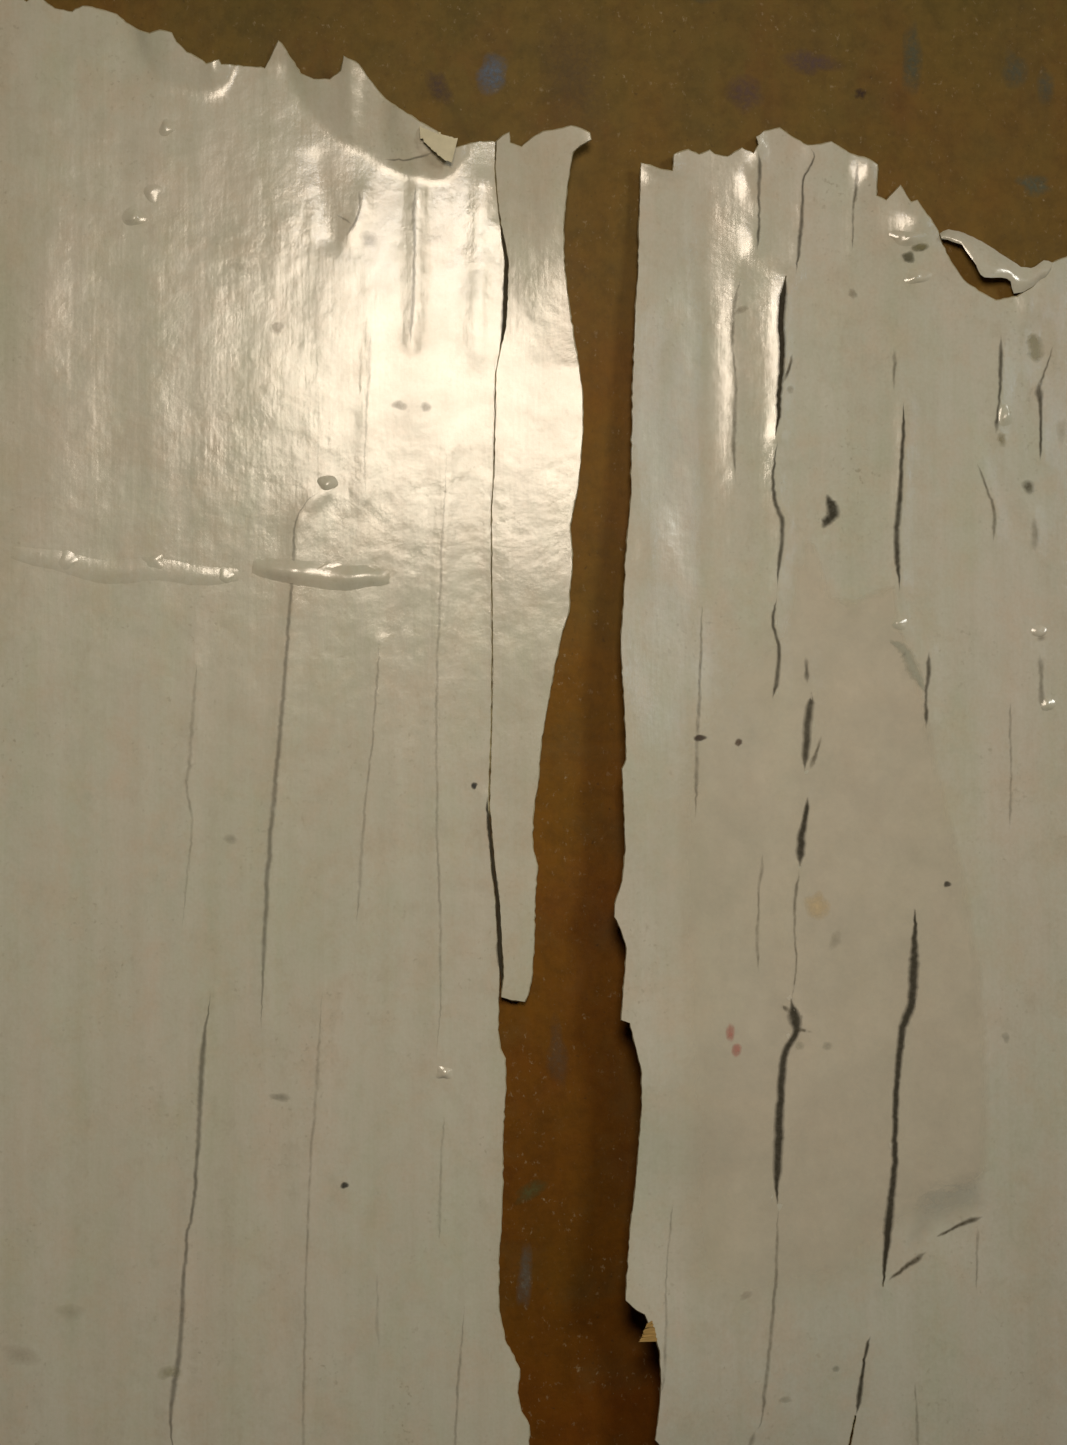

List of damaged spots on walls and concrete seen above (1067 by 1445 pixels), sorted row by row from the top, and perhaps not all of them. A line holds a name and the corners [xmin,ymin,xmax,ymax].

peeling [45,0,1067,300]
crack [772,162,813,692]
spalling [823,498,838,526]
peeling [489,125,661,1445]
crack [797,803,809,860]
crack [803,699,815,763]
crack [774,1006,803,1197]
crack [882,916,920,1286]
crack [943,1218,975,1234]